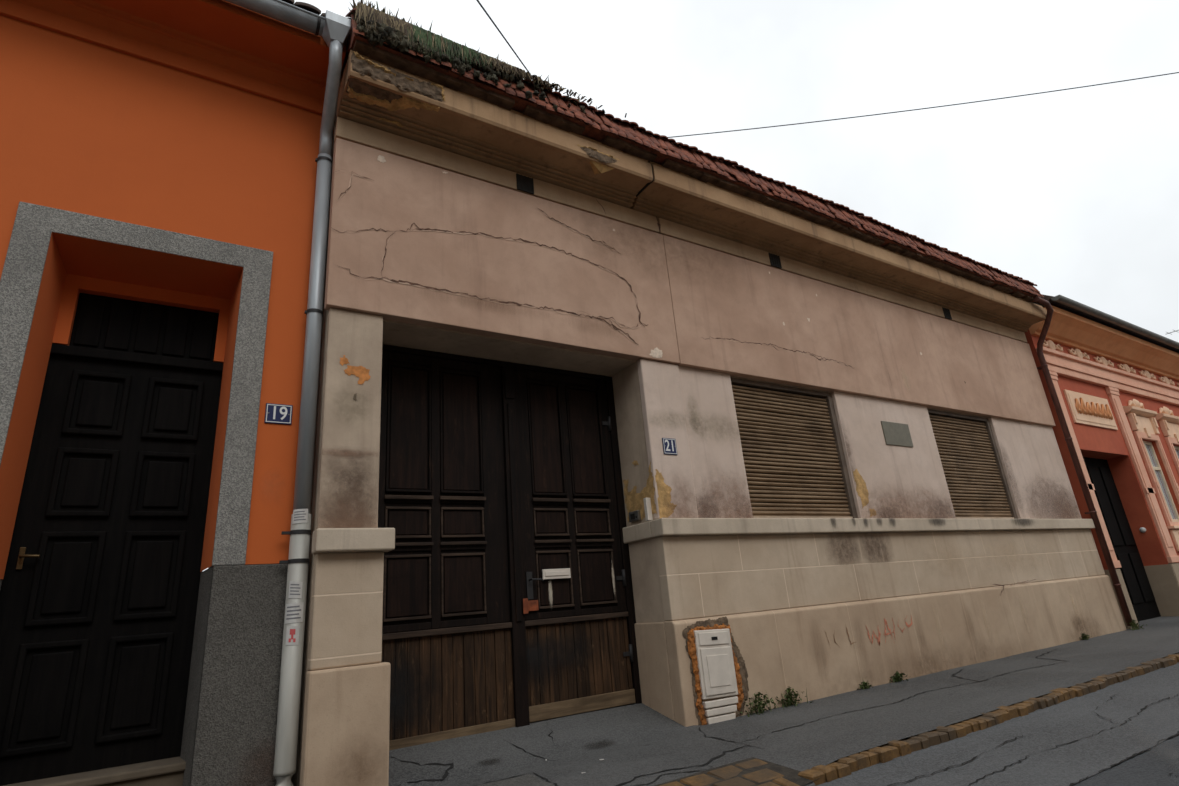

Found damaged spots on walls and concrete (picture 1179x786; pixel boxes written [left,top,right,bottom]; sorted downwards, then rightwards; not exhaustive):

peeling [347,83,446,127]
crack [331,208,647,345]
peeling [340,355,371,401]
crack [702,337,852,368]
peeling [623,460,677,522]
flaking render [682,616,749,725]